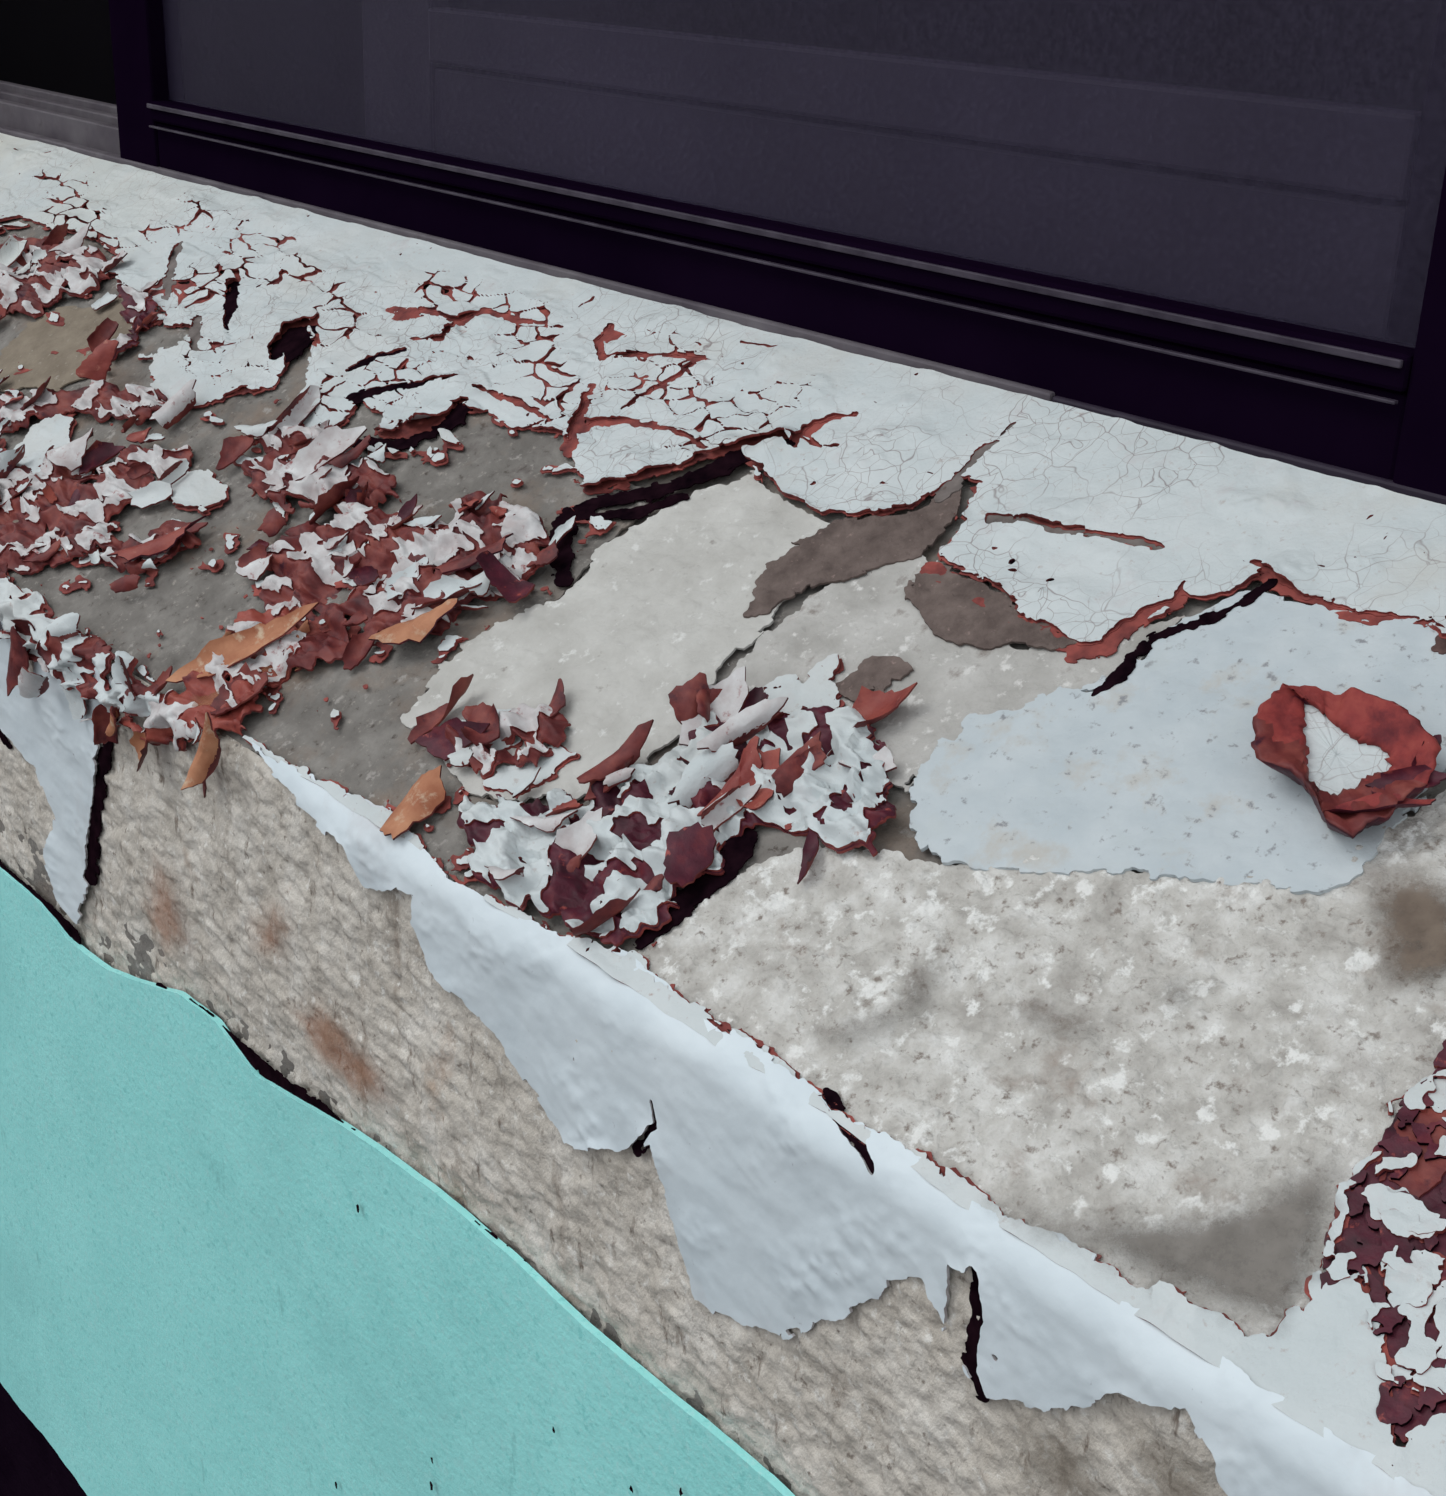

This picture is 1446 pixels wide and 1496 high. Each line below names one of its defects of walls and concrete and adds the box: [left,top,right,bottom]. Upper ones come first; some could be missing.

crack [161,242,240,351]
crack [269,325,317,363]
peeling [0,218,640,747]
crack [345,308,751,587]
crack [784,416,855,446]
crack [934,423,1016,503]
crack [986,515,1163,550]
crack [1023,563,1401,696]
crack [1431,634,1446,655]
peeling [0,737,55,896]
flaking render [55,470,1446,1496]
damp [1375,880,1446,978]